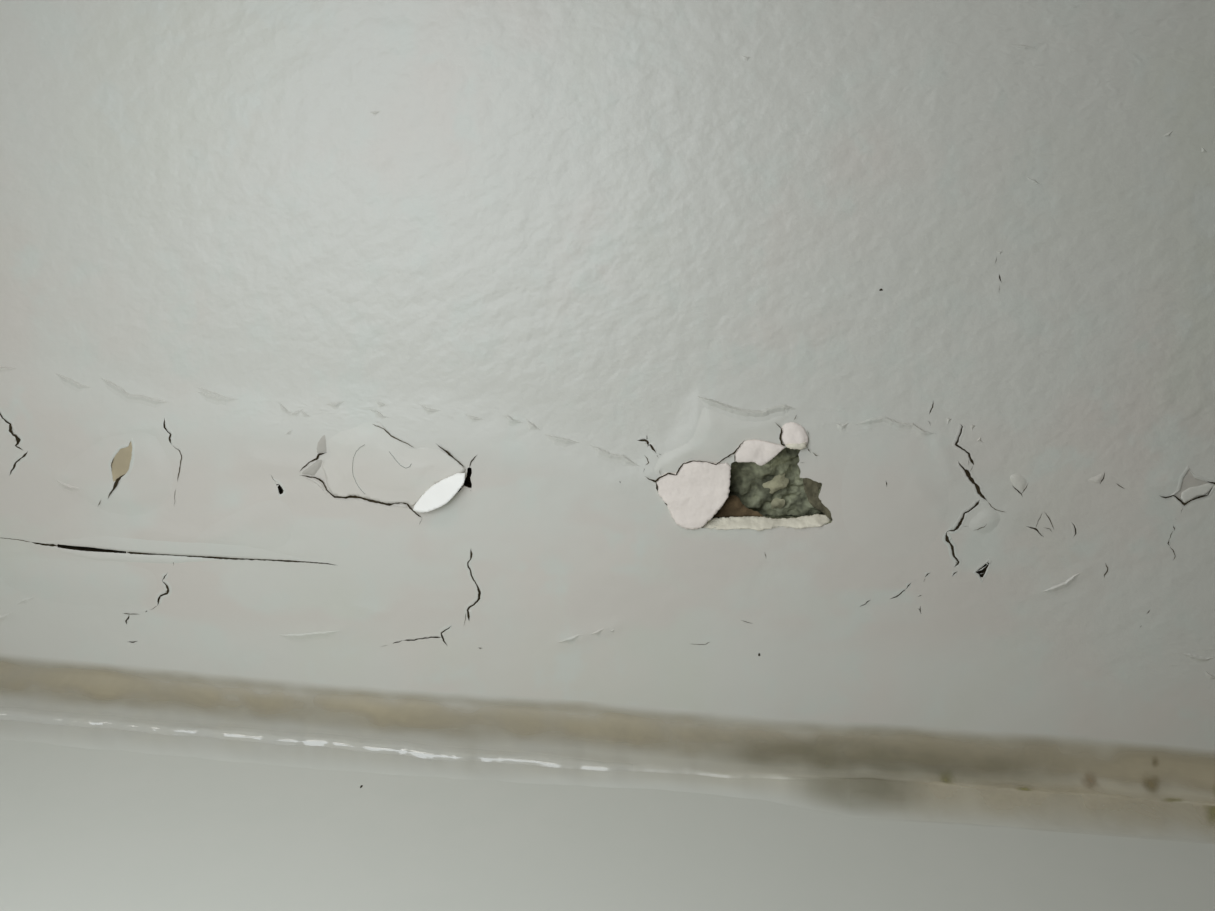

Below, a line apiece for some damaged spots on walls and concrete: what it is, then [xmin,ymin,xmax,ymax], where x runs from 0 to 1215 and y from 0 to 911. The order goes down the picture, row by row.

crack [0,408,28,476]
peeling [98,438,135,505]
peeling [657,422,808,530]
crack [860,401,1079,614]
peeling [1159,466,1215,507]
crack [4,536,333,645]
crack [385,548,484,650]
leakage [0,661,1215,790]